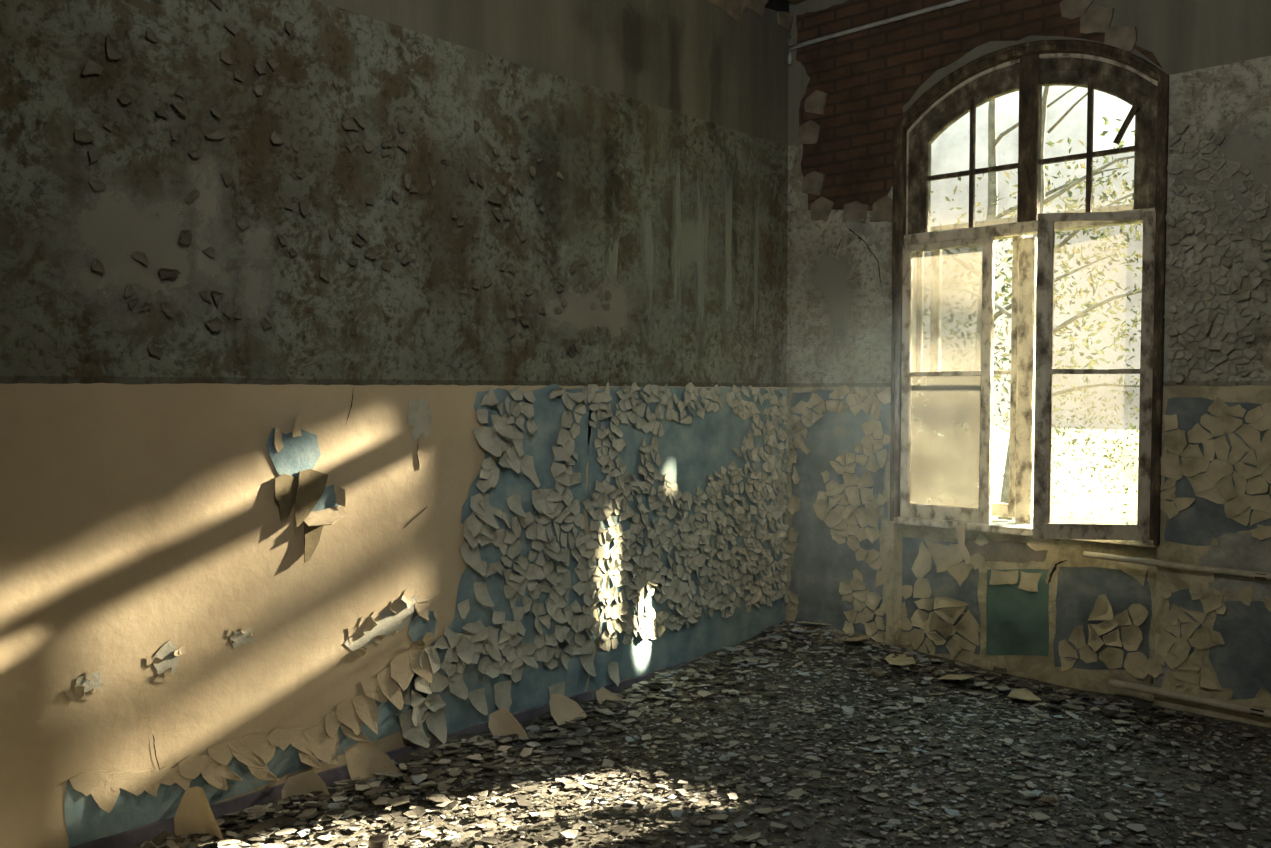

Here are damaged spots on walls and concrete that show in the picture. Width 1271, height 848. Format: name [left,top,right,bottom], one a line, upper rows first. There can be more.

flaking render [745,0,1163,224]
water stain [71,164,222,310]
water stain [545,239,630,339]
water stain [672,164,710,324]
water stain [725,171,733,312]
peeling [1053,122,1271,702]
peeling [64,382,1050,848]